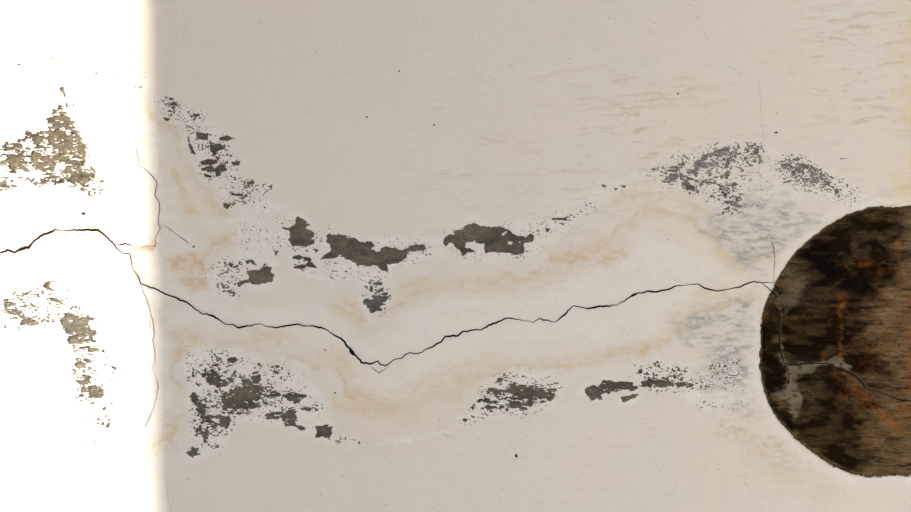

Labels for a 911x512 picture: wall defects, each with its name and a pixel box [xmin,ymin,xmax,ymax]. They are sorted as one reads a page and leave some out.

peeling [0,266,130,458]
damp [0,86,814,462]
peeling [0,60,863,330]
crack [0,59,911,462]
peeling [173,338,756,465]